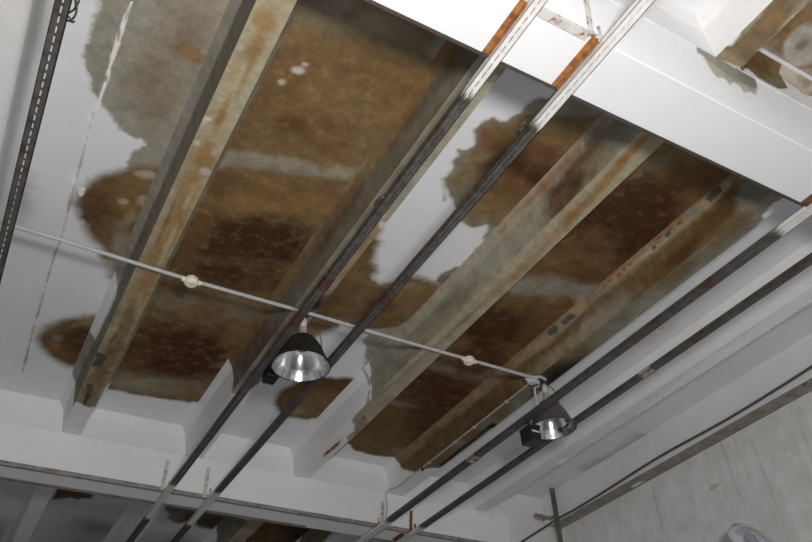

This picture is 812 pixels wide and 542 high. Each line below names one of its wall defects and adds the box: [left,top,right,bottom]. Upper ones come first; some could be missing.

crack [87,0,132,122]
water stain [697,0,812,94]
peeling [780,64,812,96]
crack [68,164,85,211]
water stain [39,0,256,405]
corrosion [75,0,297,407]
water stain [107,0,506,402]
water stain [332,97,782,472]
water stain [276,377,353,419]